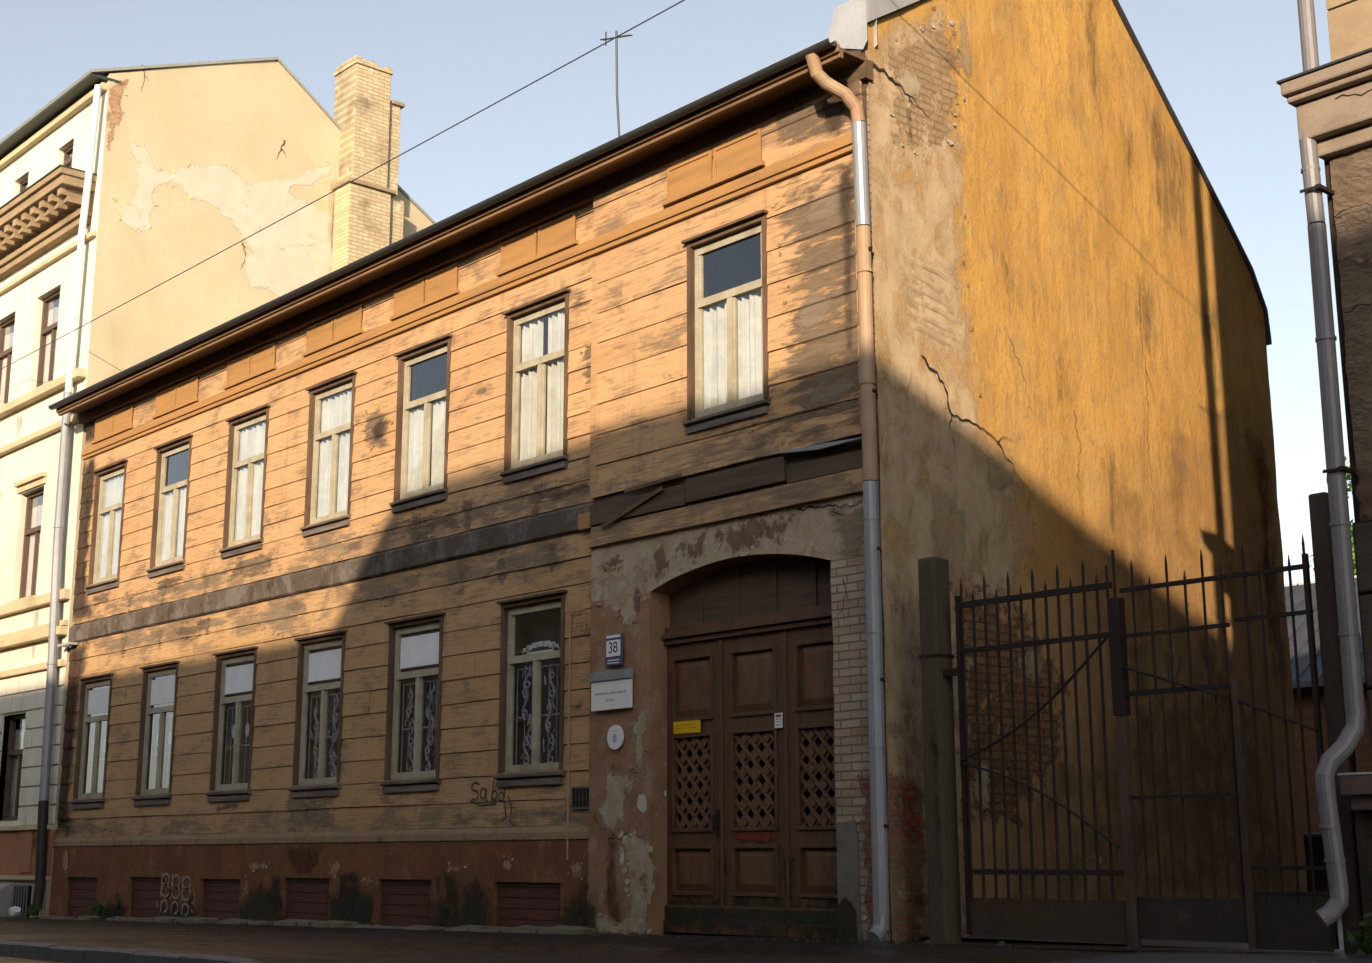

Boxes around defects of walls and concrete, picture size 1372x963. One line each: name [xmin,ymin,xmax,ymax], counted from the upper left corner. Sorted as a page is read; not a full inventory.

flaking render [106,79,128,150]
peeling [112,143,332,296]
peeling [747,6,1070,942]
crack [921,336,1040,498]
peeling [596,514,793,627]
flaking render [453,710,655,934]
damp [833,882,858,941]